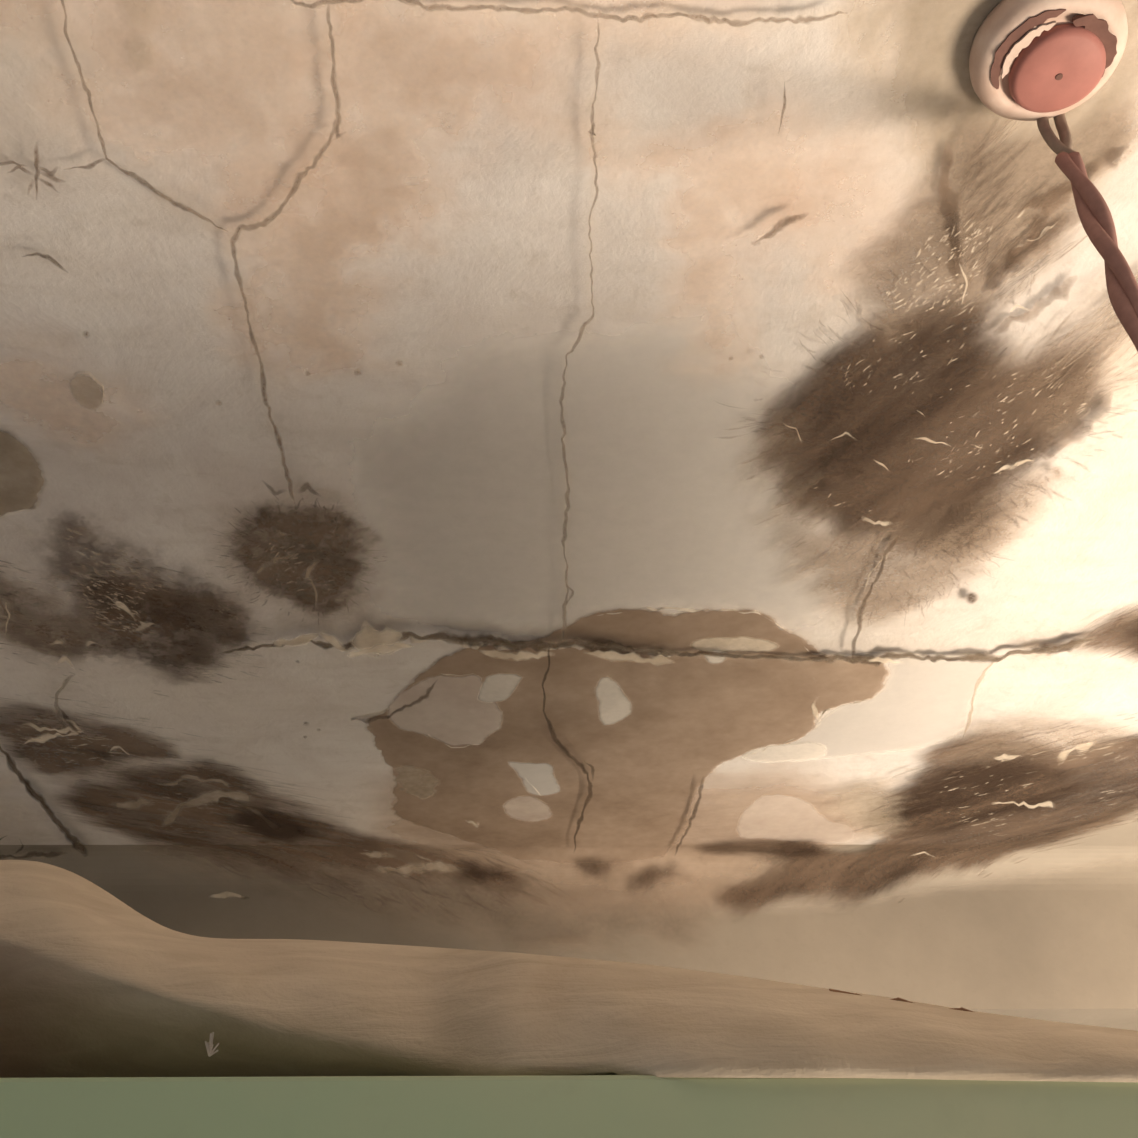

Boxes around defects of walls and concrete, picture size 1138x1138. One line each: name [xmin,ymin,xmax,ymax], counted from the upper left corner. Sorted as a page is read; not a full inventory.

peeling [0,431,45,518]
crack [0,0,364,503]
leakage [0,0,1138,683]
crack [221,0,1096,854]
crack [0,746,88,859]
crack [54,675,77,731]
leakage [0,651,1138,940]
peeling [351,607,890,864]